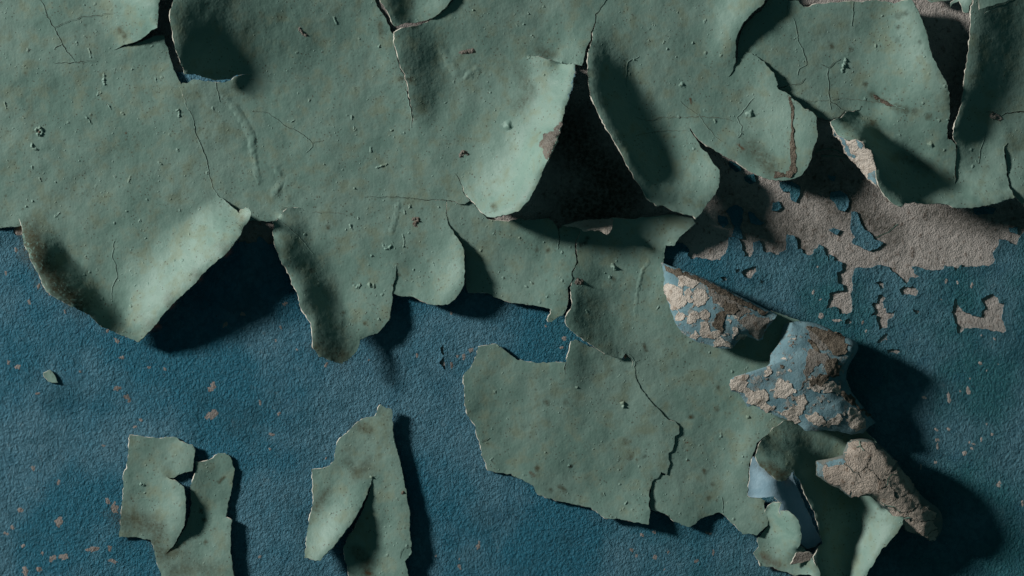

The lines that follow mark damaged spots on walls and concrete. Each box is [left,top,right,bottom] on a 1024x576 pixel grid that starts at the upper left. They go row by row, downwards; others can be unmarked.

crack [39,0,115,64]
crack [778,1,905,121]
crack [180,88,239,214]
peeling [0,0,1024,364]
spalling [22,551,68,576]
peeling [43,370,58,383]
peeling [85,418,235,576]
peeling [304,405,412,576]
crack [628,354,680,508]
peeling [462,40,943,576]